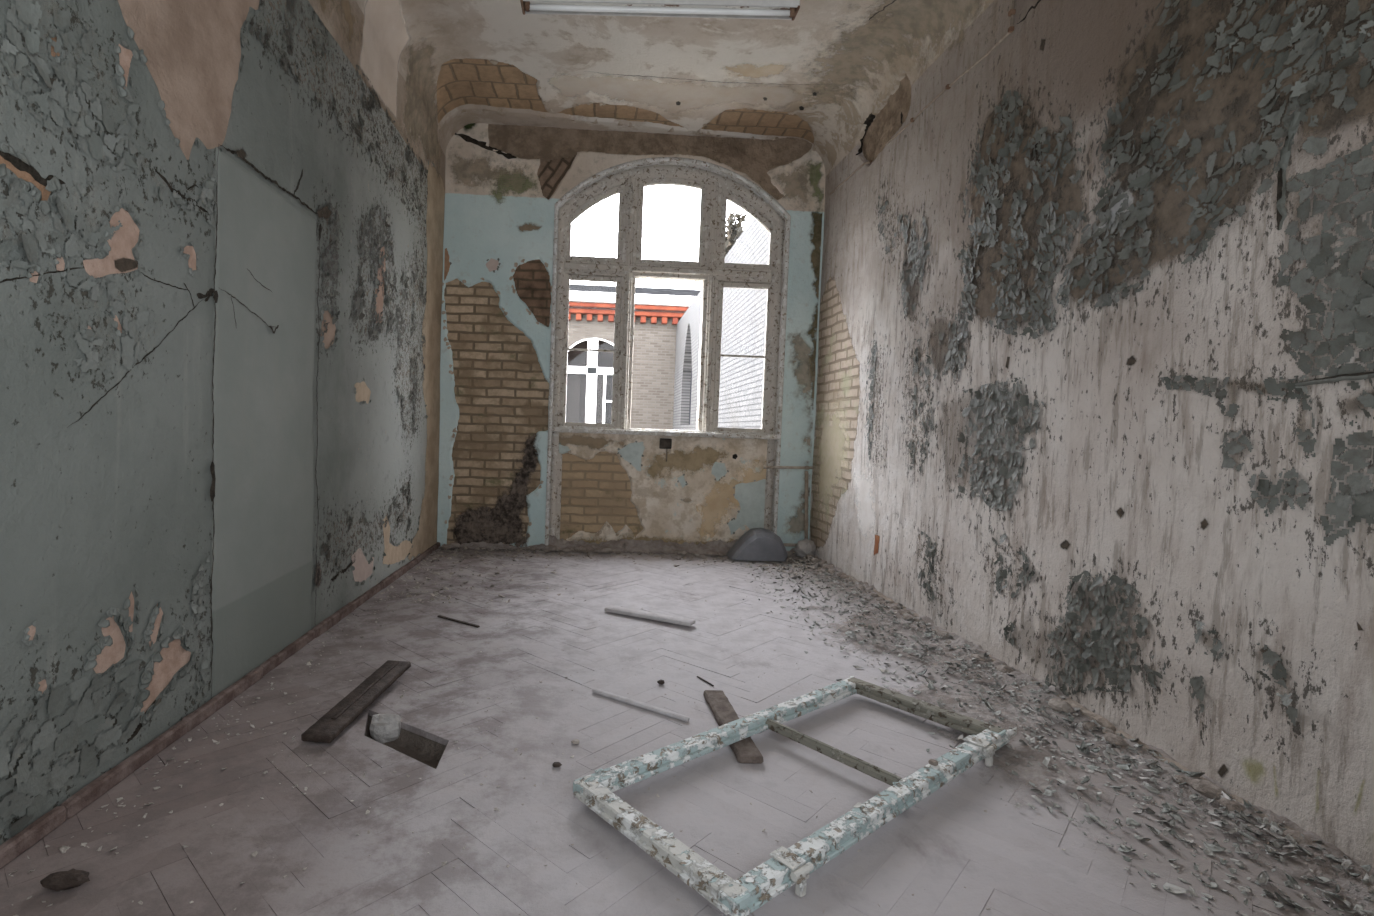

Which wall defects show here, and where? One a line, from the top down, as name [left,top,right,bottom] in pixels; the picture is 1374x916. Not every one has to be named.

crack [1017,0,1041,24]
flaking render [434,58,817,200]
flaking render [856,73,911,162]
crack [0,267,79,283]
peeling [877,0,1374,546]
crack [67,145,354,697]
flaking render [810,276,885,550]
flaking render [559,441,645,540]
peeling [917,531,947,607]
peeling [981,533,1035,598]
peeling [1003,571,1166,696]
peeling [0,556,211,837]